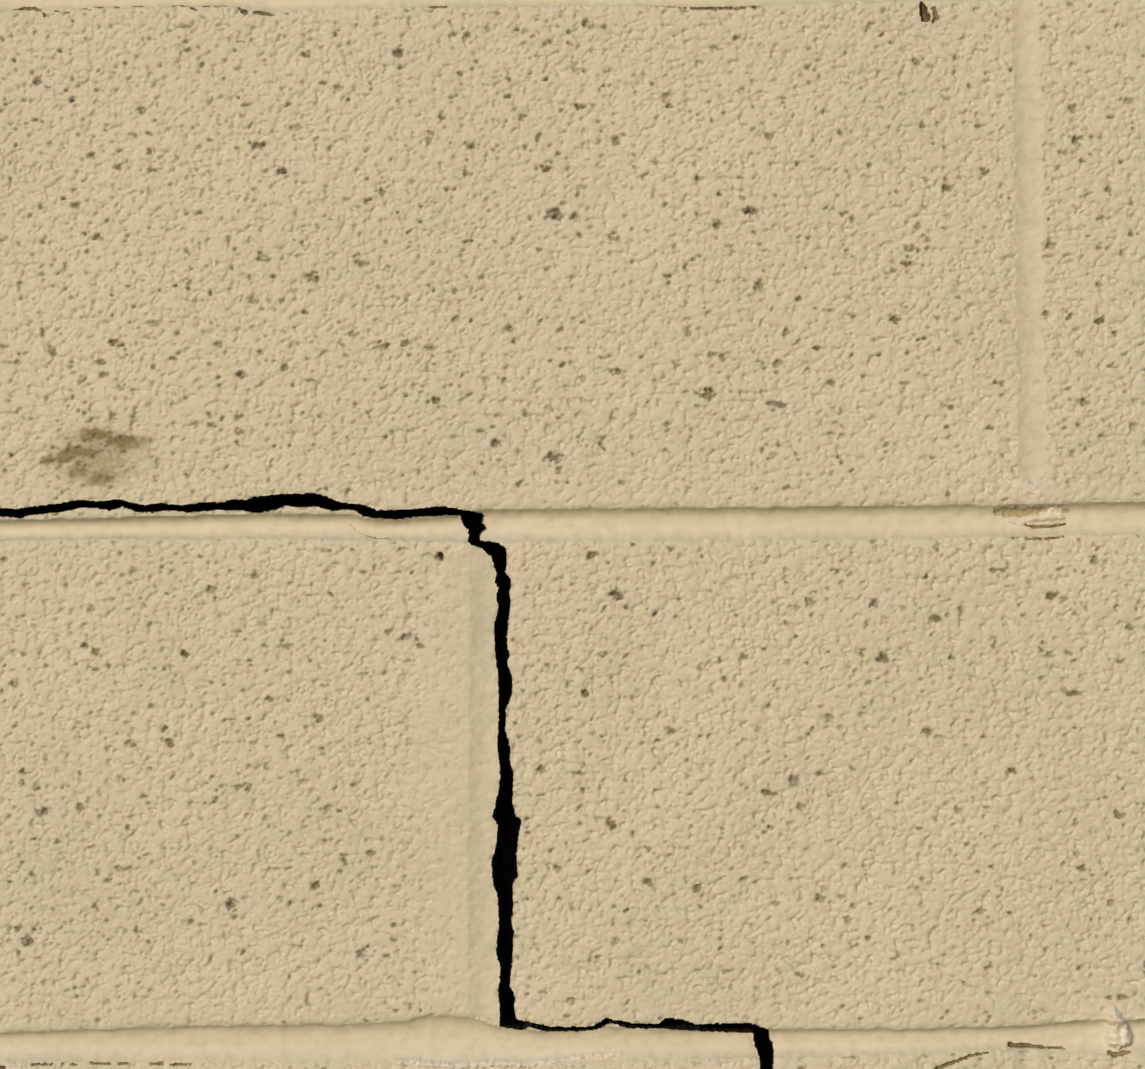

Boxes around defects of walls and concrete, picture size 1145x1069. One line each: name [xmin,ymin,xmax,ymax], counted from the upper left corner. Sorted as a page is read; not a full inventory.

crack [0,493,774,1069]